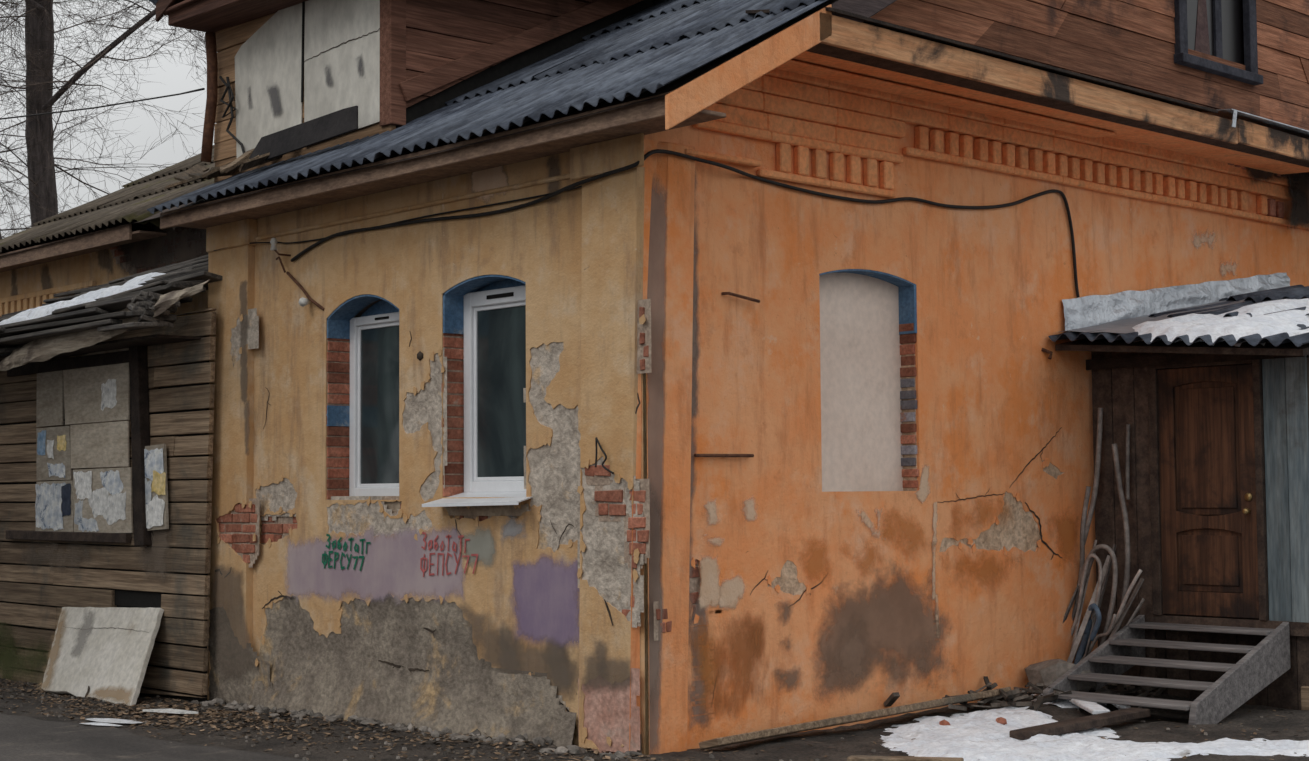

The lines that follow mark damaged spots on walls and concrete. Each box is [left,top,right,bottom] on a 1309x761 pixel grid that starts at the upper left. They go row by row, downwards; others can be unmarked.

spalling [216,475,297,568]
flaking render [326,348,447,541]
flaking render [511,342,672,641]
water stain [689,223,699,578]
flaking render [939,492,1043,555]
spalling [689,557,701,624]
peeling [719,575,745,608]
flaking render [767,560,811,595]
water stain [819,502,946,694]
flaking render [208,609,272,705]
water stain [689,602,763,723]